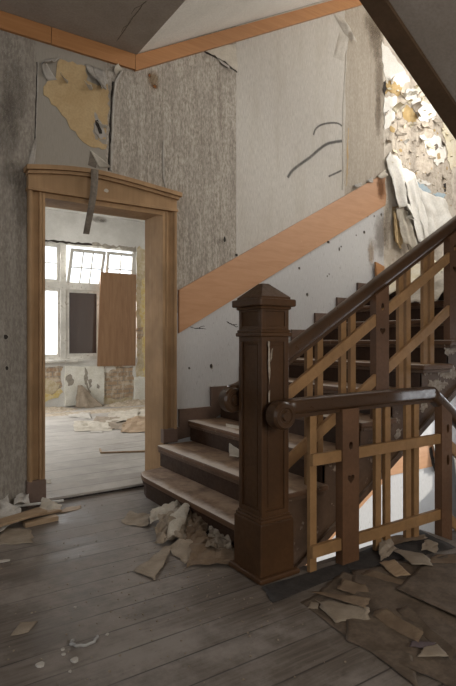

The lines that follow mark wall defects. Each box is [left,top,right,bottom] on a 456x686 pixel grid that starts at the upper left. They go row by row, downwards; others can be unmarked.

peeling [381,42,456,206]
flaking render [45,366,74,402]
flaking render [84,246,145,404]